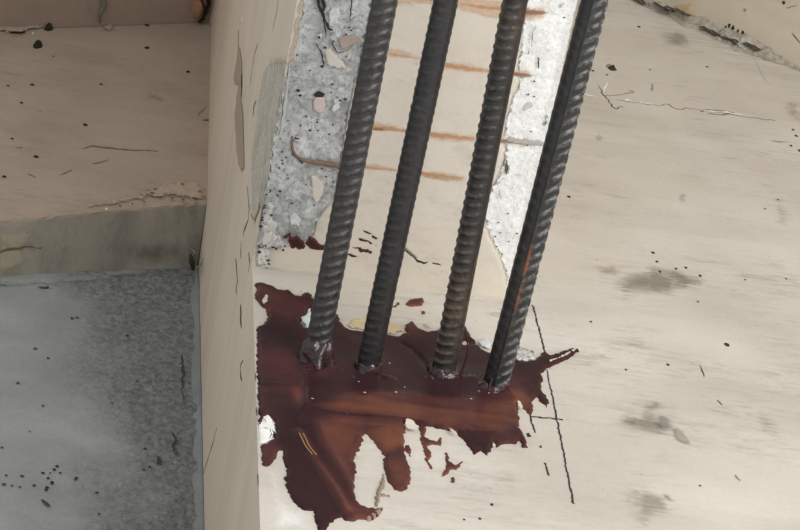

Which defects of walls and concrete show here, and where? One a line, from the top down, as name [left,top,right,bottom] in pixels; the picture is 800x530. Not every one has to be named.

corrosion [458,0,502,18]
corrosion [525,9,549,19]
corrosion [444,63,489,72]
crack [598,84,775,121]
spalling [257,0,371,269]
spalling [485,0,577,284]
corrosion [421,172,462,180]